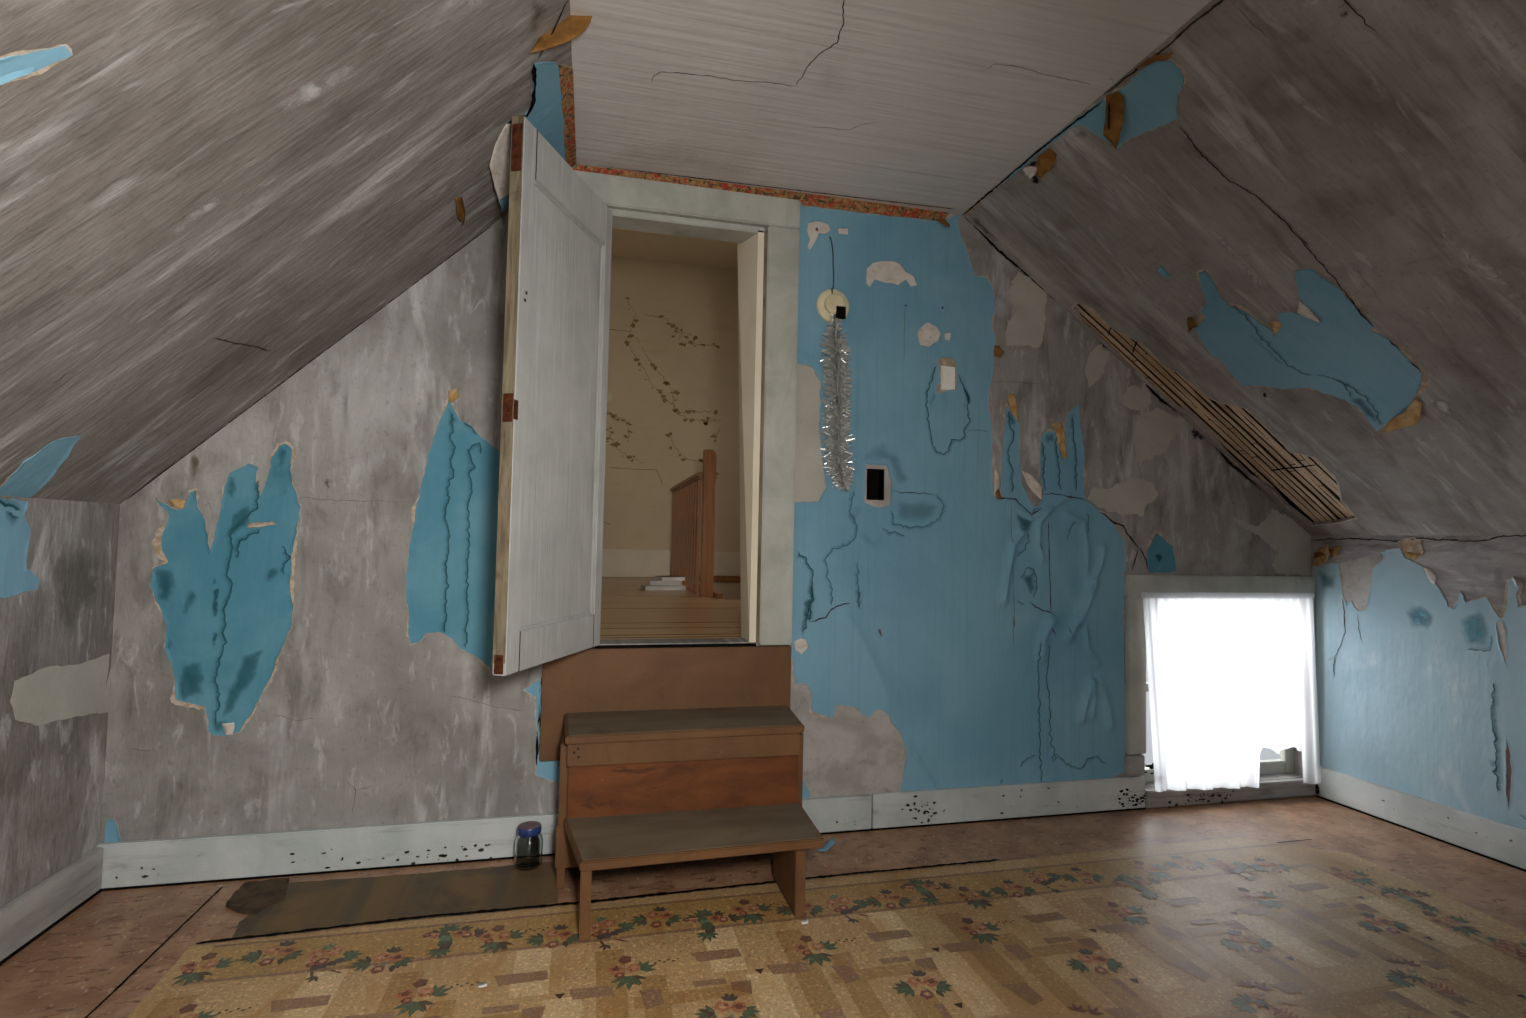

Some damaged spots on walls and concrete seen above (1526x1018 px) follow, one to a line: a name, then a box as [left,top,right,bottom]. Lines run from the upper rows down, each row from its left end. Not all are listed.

crack [651,0,845,86]
peeling [1382,399,1422,433]
peeling [168,498,186,509]
flaking render [1313,544,1383,611]
peeling [222,722,235,736]